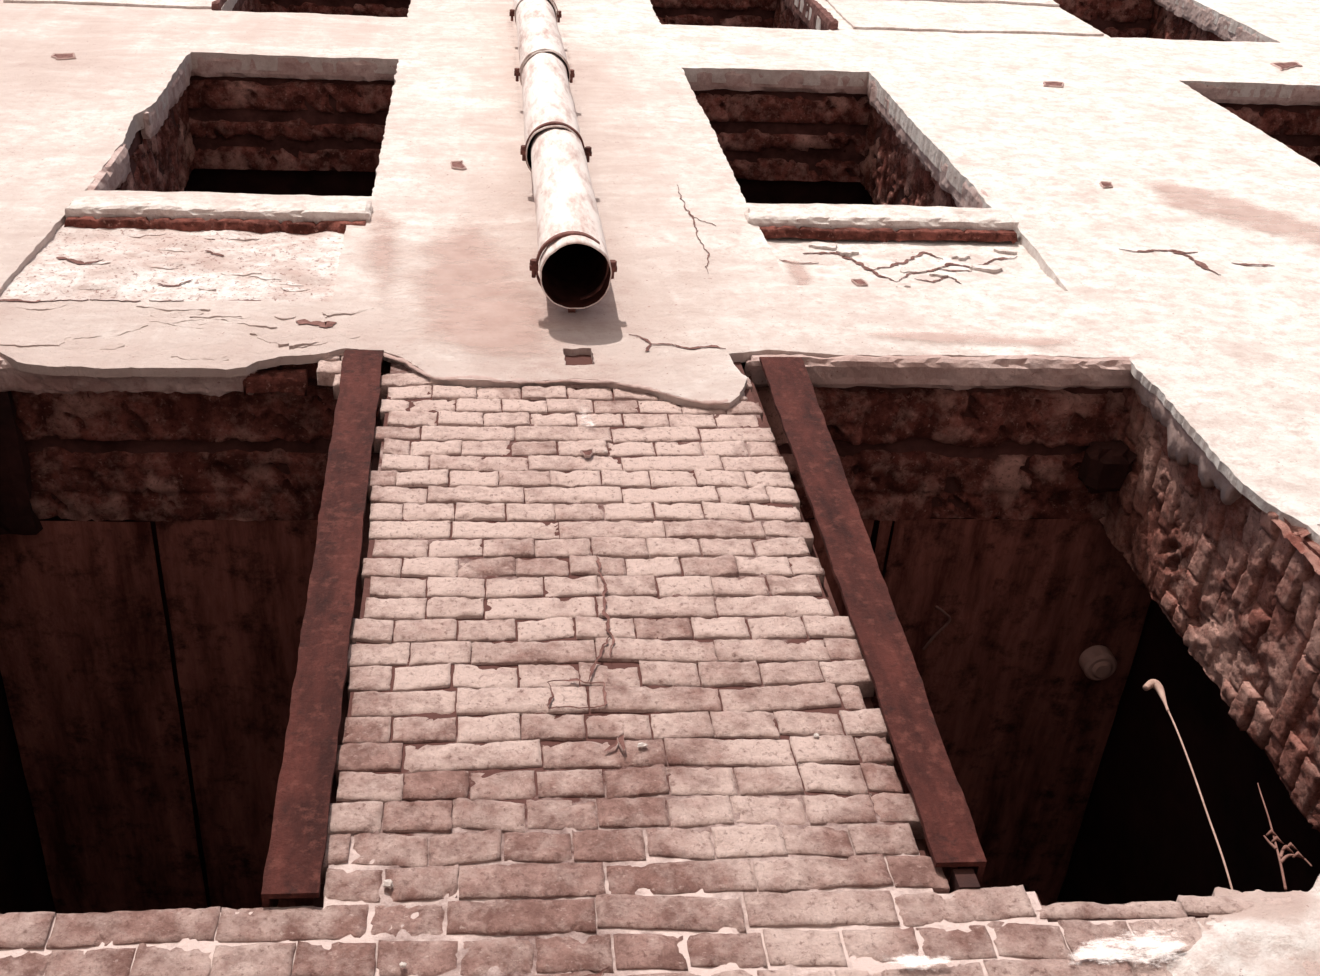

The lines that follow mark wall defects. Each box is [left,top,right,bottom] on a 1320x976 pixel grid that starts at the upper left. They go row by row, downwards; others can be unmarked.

flaking render [129,231,191,270]
flaking render [204,231,278,241]
crack [677,185,716,271]
crack [779,242,1018,288]
crack [1120,249,1273,275]
flaking render [0,267,360,399]
flaking render [322,306,373,318]
crack [629,334,726,352]
spalling [1099,378,1320,832]
spalling [321,352,950,909]